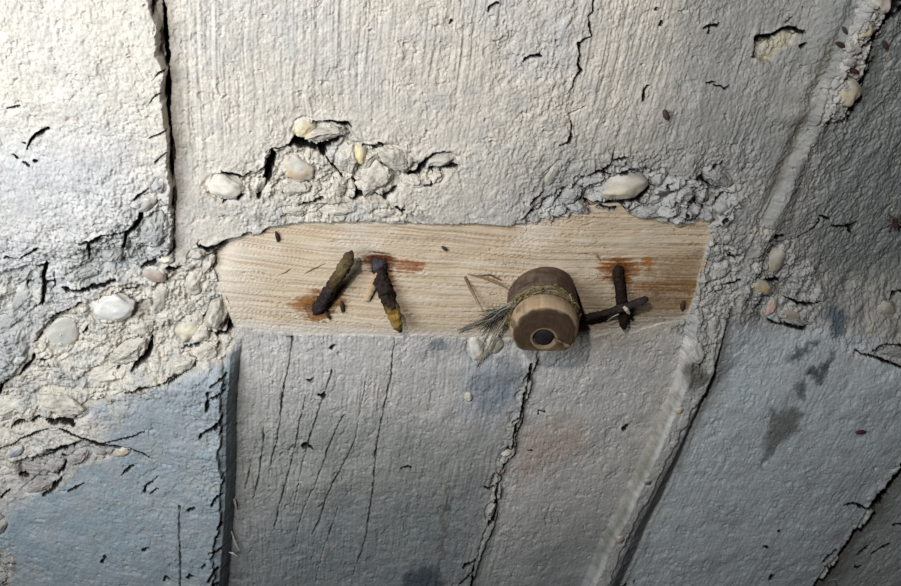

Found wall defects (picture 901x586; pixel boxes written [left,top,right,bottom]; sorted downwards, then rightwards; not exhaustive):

crack [150,0,174,182]
crack [568,0,594,92]
spalling [817,0,892,126]
crack [78,188,149,259]
spalling [0,178,235,436]
crack [0,232,252,394]
rust [288,289,346,321]
spalling [206,121,457,229]
rust [360,252,424,286]
rust [596,257,696,317]
spalling [522,164,827,379]
spalling [9,441,116,494]